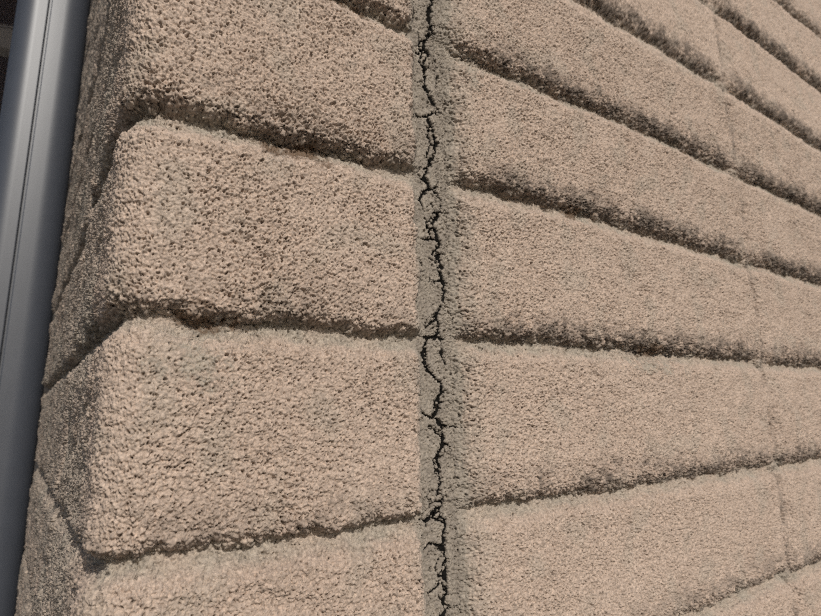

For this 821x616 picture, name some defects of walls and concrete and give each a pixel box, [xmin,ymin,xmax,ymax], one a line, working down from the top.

crack [412,0,454,616]